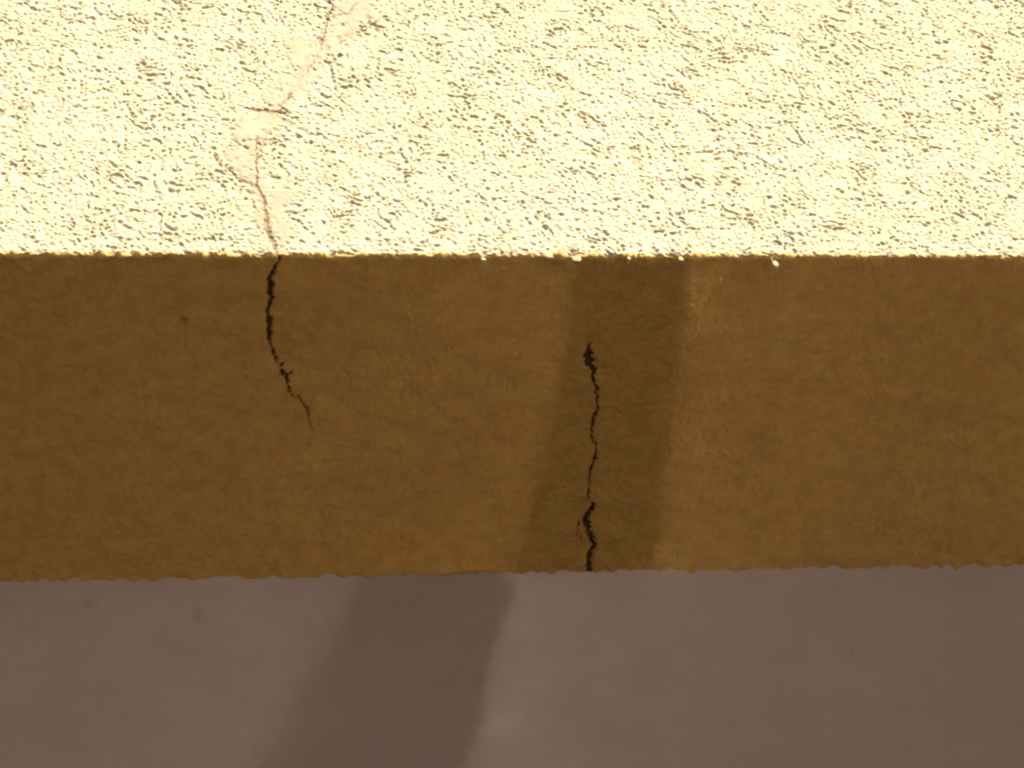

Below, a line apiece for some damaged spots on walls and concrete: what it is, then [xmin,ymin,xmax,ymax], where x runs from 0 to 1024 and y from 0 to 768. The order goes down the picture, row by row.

crack [214,0,359,420]
crack [576,343,599,572]